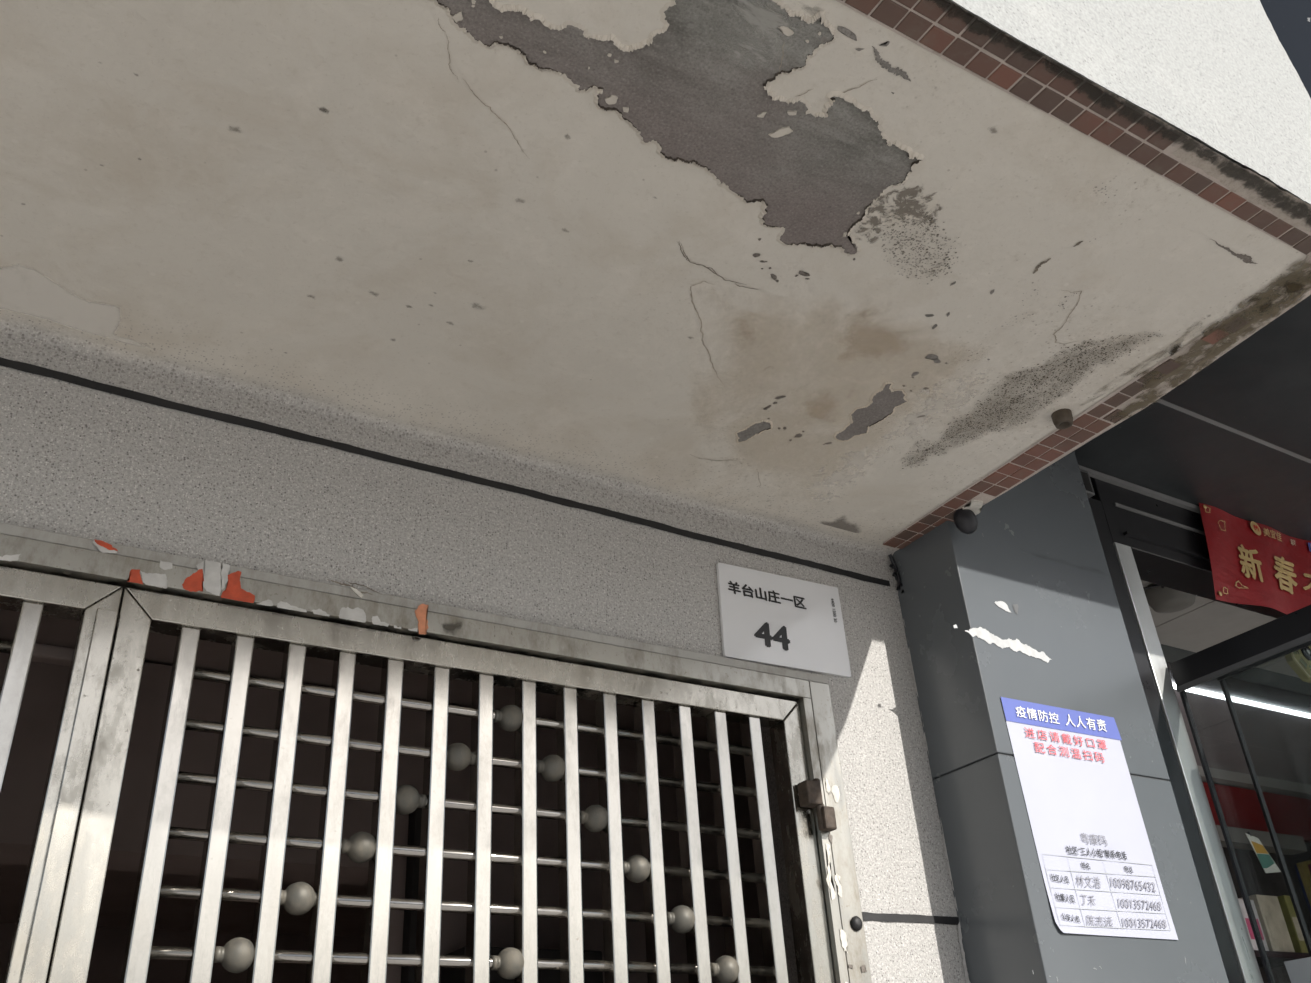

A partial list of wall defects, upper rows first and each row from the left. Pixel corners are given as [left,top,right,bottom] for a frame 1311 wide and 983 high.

peeling [429,0,959,286]
crack [679,242,758,387]
peeling [734,396,805,443]
peeling [823,354,948,445]
water stain [902,330,1160,469]
water stain [1111,260,1311,424]